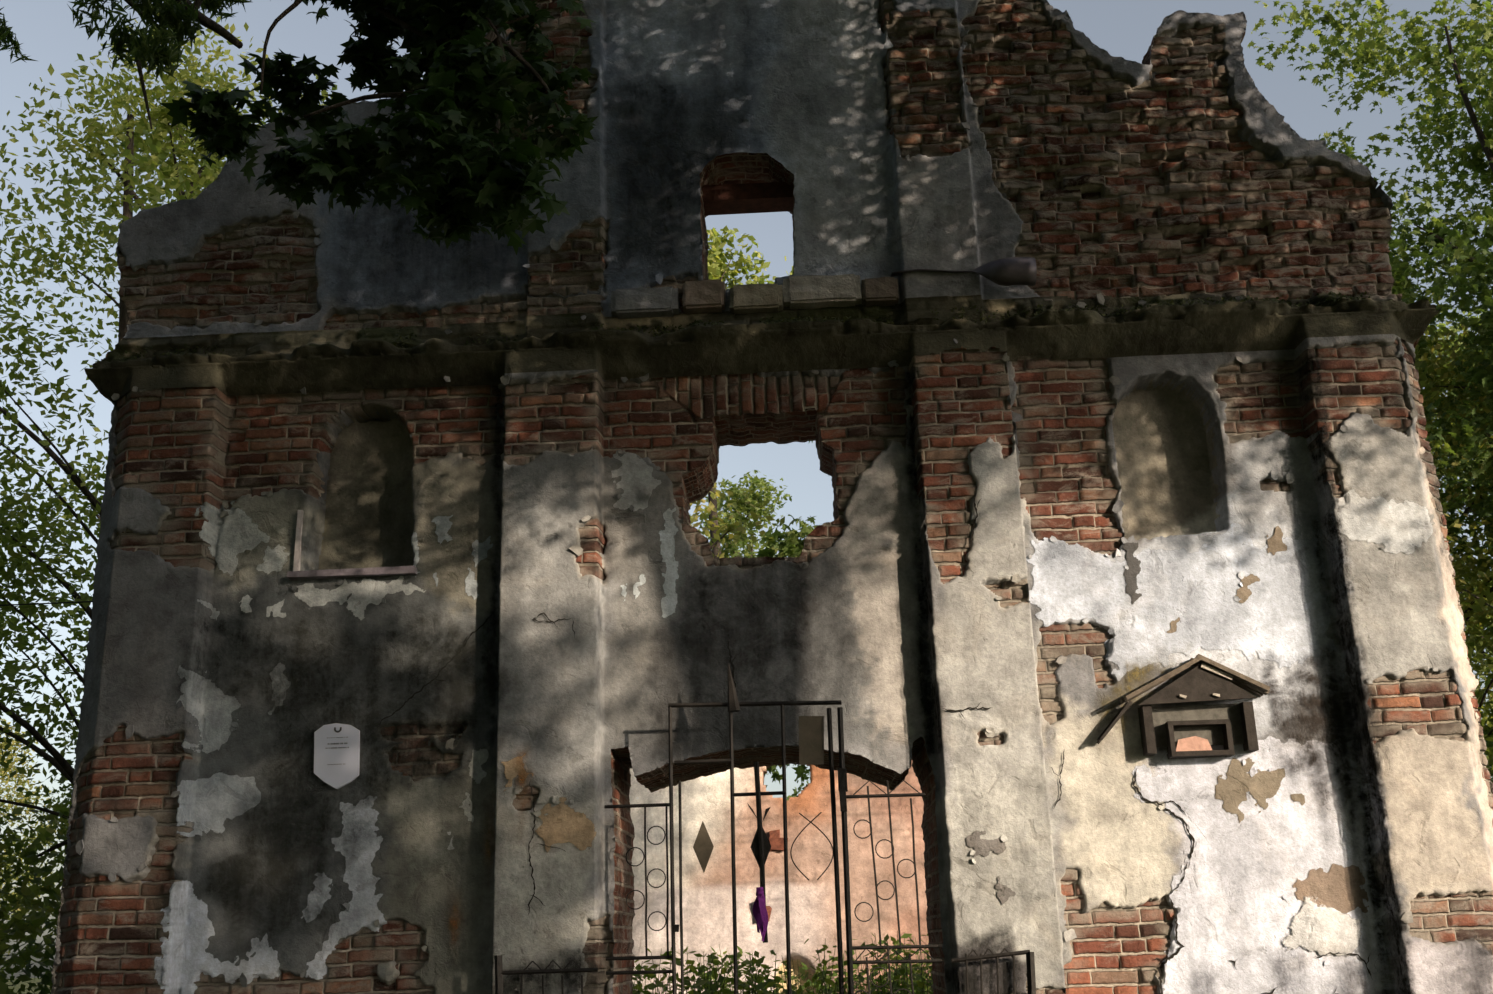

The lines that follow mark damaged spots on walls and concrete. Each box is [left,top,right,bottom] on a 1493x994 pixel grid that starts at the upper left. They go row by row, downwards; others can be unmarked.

spalling [118,211,609,334]
spalling [878,0,1402,308]
spalling [54,665,435,994]
water stain [188,386,502,932]
crack [528,783,566,912]
spalling [574,915,614,994]
peeling [110,339,1470,725]
peeling [966,831,1008,864]
spalling [977,728,1004,746]
crack [1133,769,1195,994]
peeling [1026,667,1493,994]
water stain [1263,355,1416,994]